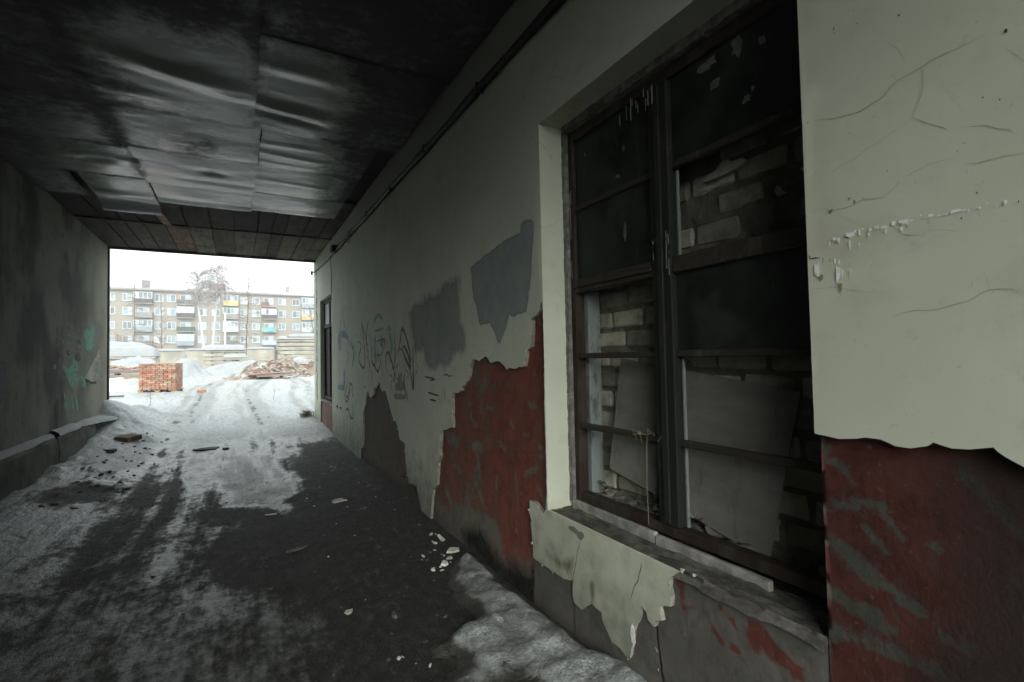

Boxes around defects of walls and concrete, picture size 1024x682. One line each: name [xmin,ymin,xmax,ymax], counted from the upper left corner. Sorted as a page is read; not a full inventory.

crack [812,34,1022,228]
peeling [829,192,1019,251]
flaking render [361,386,411,499]
flaking render [433,311,1024,682]